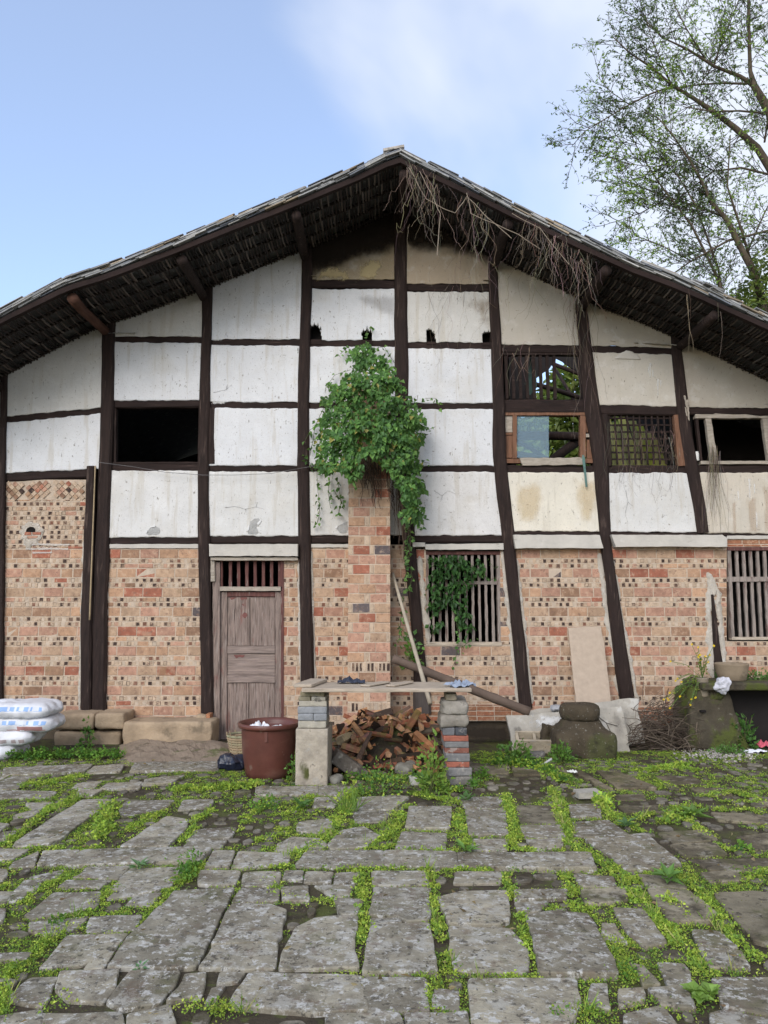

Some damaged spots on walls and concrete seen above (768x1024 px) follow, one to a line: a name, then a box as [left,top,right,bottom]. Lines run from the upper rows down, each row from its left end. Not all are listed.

flaking render [247,518,262,535]